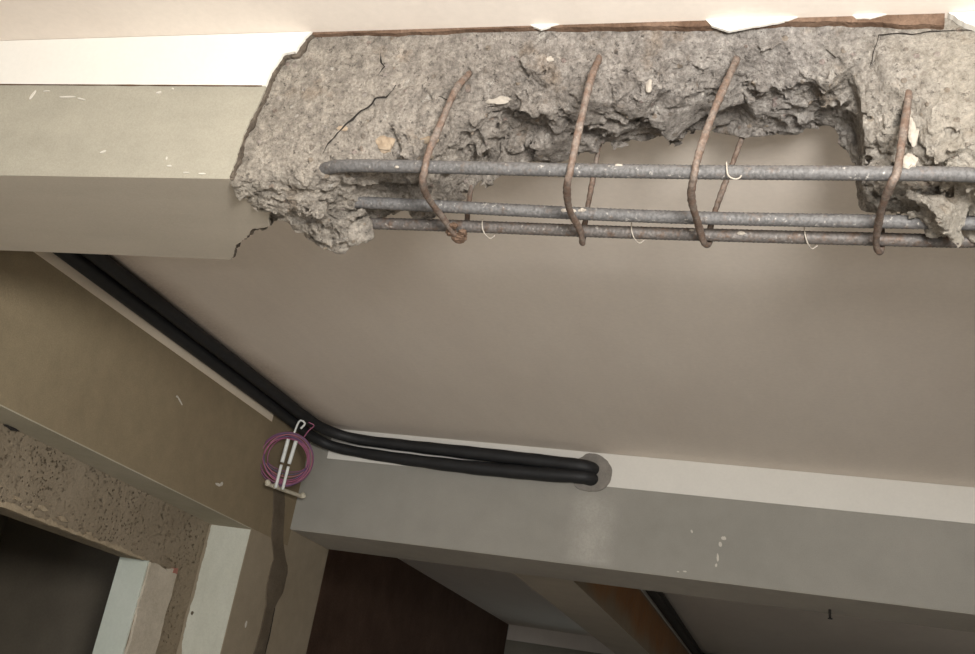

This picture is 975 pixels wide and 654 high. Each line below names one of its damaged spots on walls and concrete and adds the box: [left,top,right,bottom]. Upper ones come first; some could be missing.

spalling [230,13,975,258]